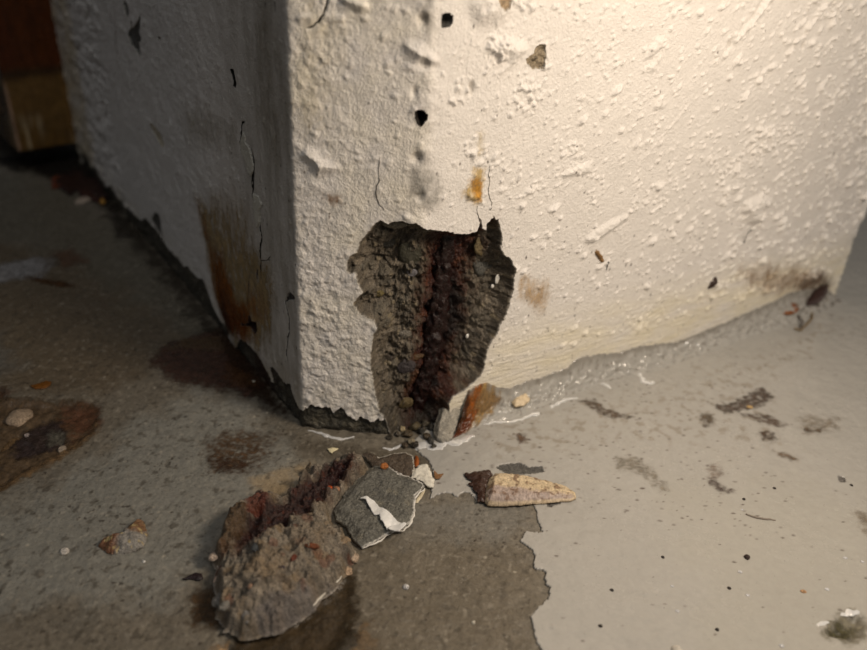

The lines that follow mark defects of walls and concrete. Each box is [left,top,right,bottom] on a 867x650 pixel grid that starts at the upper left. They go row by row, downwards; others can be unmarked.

peeling [123,0,141,58]
crack [306,0,328,28]
peeling [526,44,547,70]
crack [239,121,270,289]
corrosion [467,169,482,202]
peeling [79,143,228,335]
corrosion [150,203,286,413]
spalling [237,216,517,443]
corrosion [453,383,500,438]